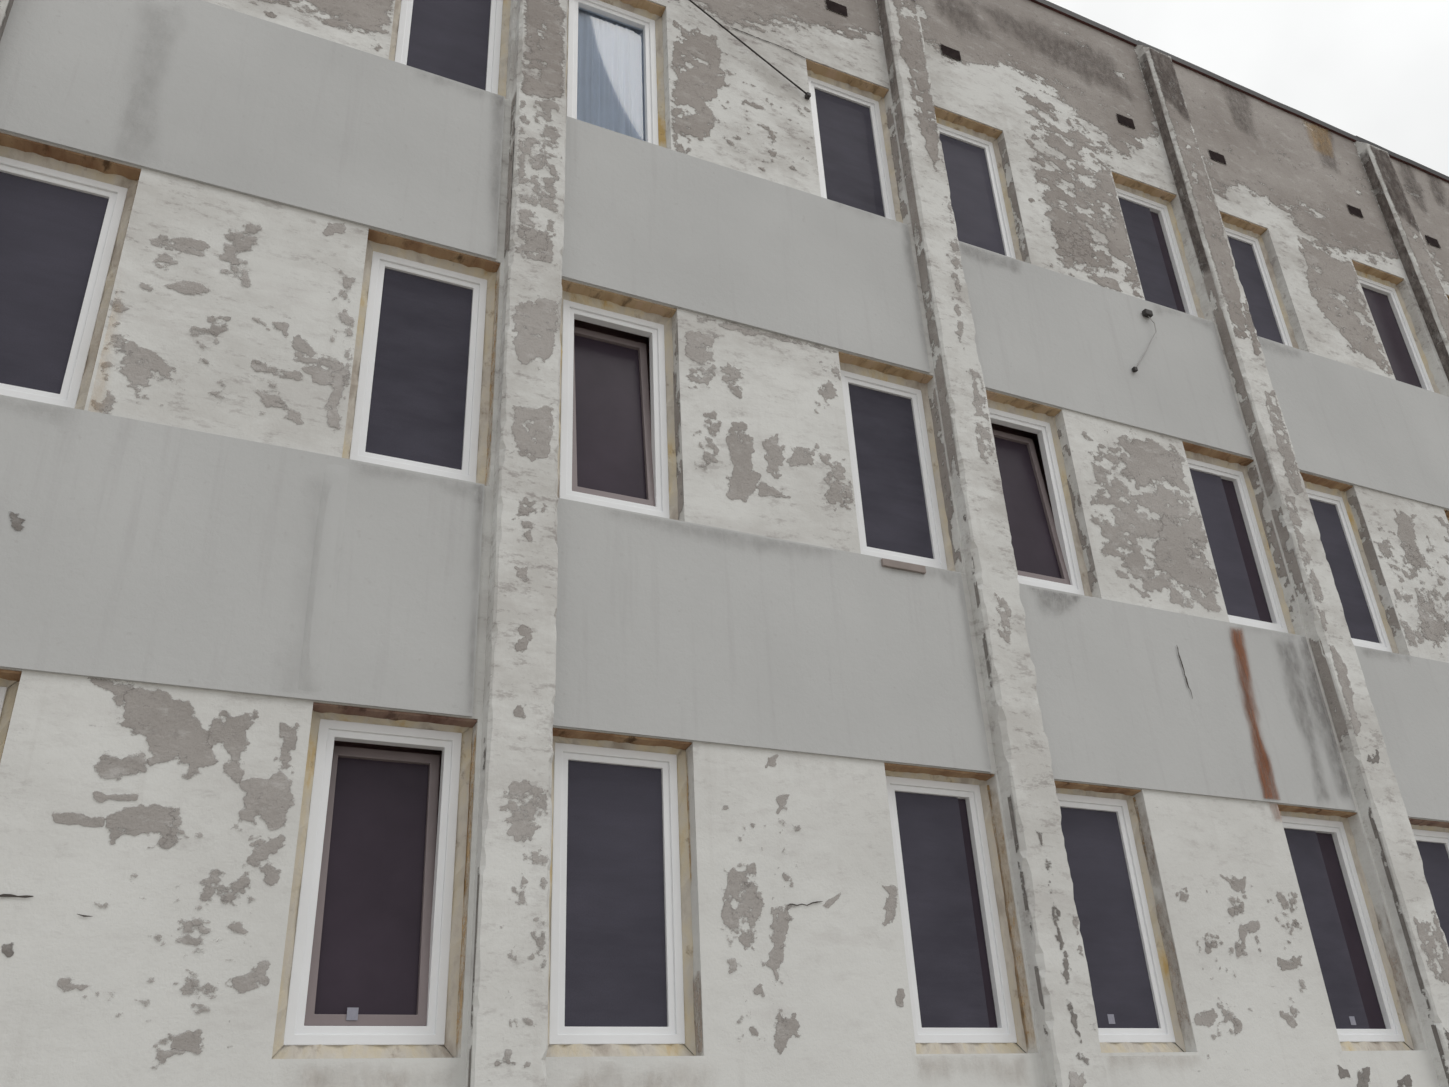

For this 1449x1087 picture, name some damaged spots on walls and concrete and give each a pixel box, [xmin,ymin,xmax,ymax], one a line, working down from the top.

peeling [251,0,394,51]
peeling [140,224,262,295]
peeling [92,291,176,414]
peeling [251,271,355,429]
peeling [669,0,1449,742]
corrosion [1233,629,1278,800]
peeling [88,677,299,952]
peeling [500,779,548,904]
peeling [153,961,270,1068]
peeling [721,863,794,997]
peeling [737,1009,800,1055]
peeling [1197,875,1305,1028]